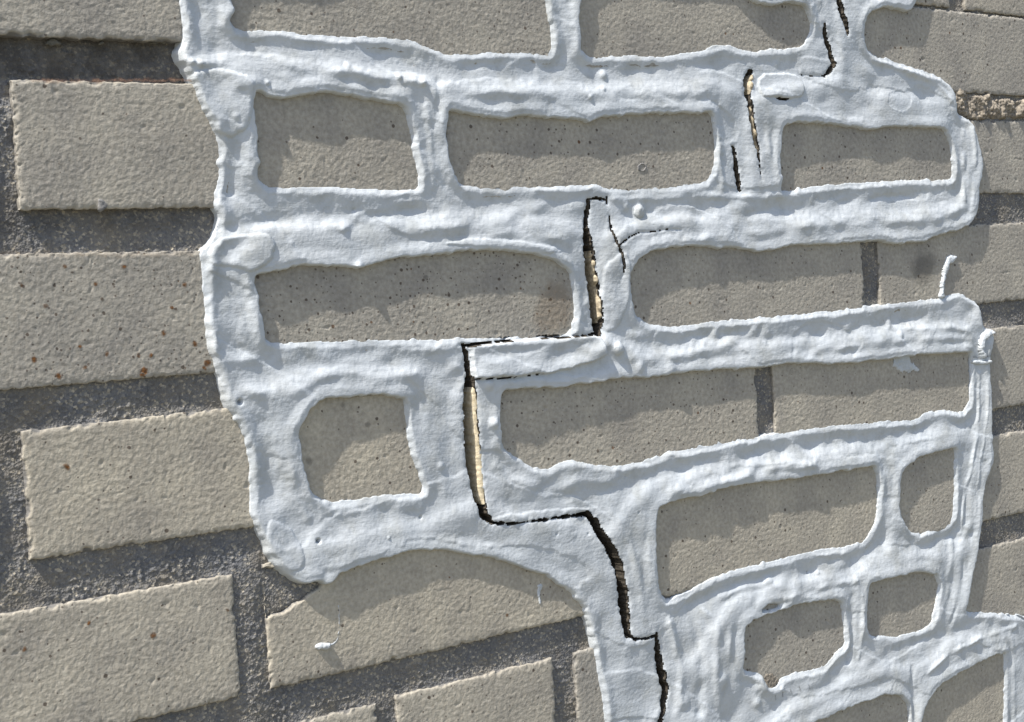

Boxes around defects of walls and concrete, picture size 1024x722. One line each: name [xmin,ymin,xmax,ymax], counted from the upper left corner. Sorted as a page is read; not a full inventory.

crack [801,0,848,78]
crack [731,69,789,192]
crack [540,196,668,340]
crack [461,339,668,722]